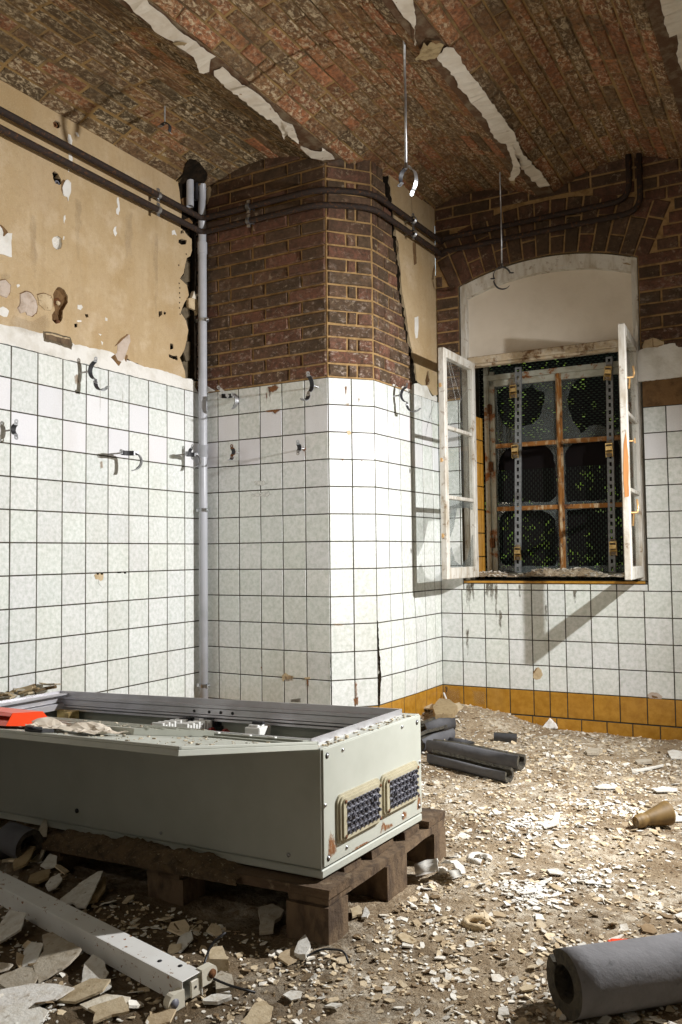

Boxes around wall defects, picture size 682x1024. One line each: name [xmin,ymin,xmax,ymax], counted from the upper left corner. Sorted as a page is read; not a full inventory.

peeling [660,0,682,70]
peeling [124,0,334,161]
peeling [393,0,550,188]
peeling [0,225,12,257]
spalling [52,236,65,250]
spalling [43,287,86,350]
peeling [99,334,131,366]
spalling [169,184,212,381]
crack [383,176,417,385]
crack [375,621,383,706]